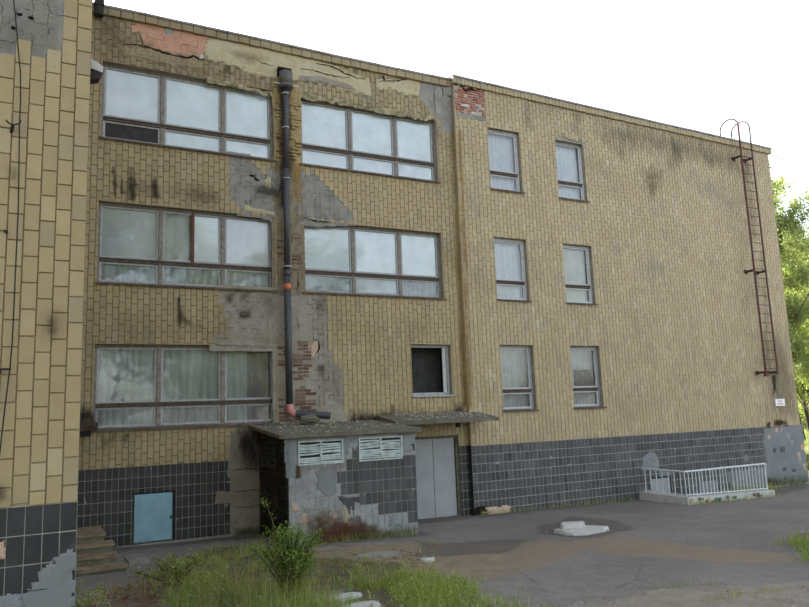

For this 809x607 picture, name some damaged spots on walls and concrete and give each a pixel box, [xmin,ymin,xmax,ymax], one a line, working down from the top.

flaking render [0,0,71,67]
crack [108,32,212,62]
spalling [131,23,486,424]
peeling [215,423,263,536]
peeling [315,465,361,523]
flaking render [763,422,809,485]